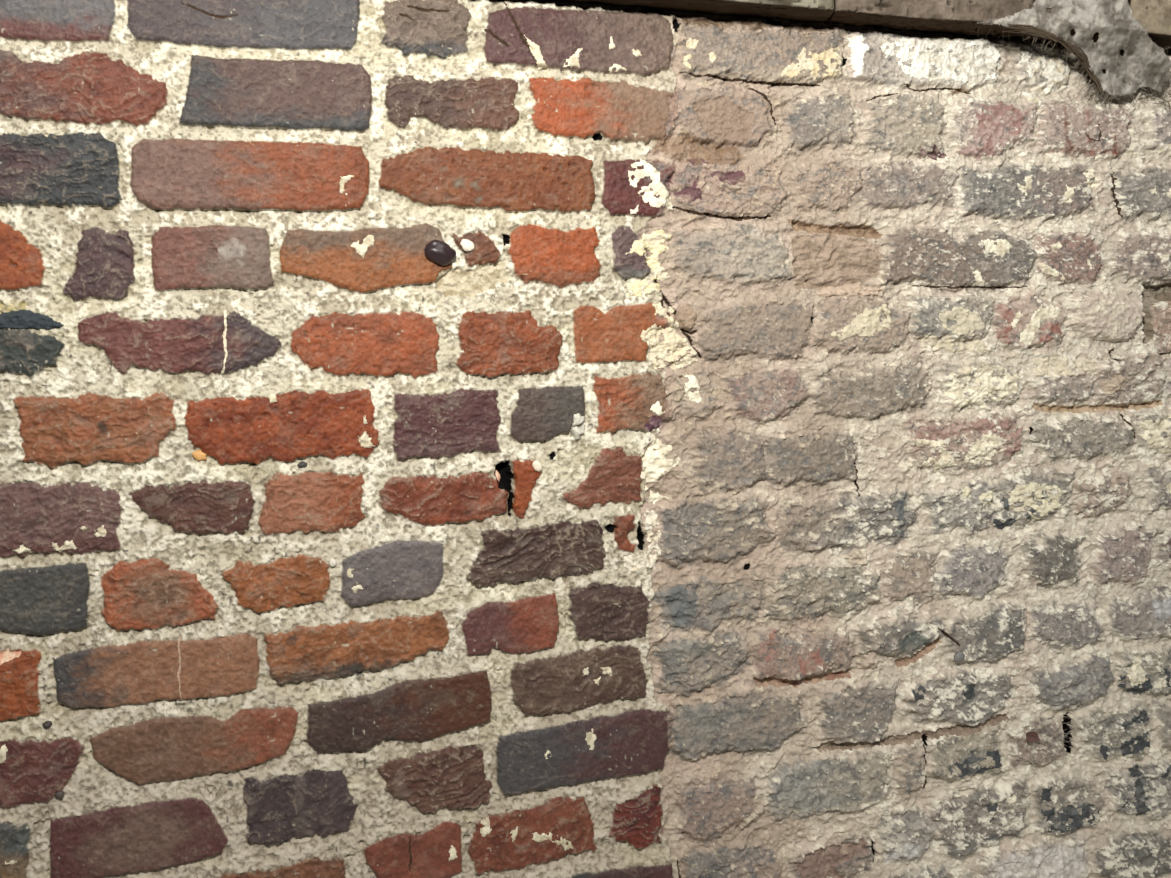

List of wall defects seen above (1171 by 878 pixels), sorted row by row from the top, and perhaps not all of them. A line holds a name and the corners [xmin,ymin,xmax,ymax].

crack [679,71,820,126]
peeling [628,95,755,214]
crack [1111,172,1123,217]